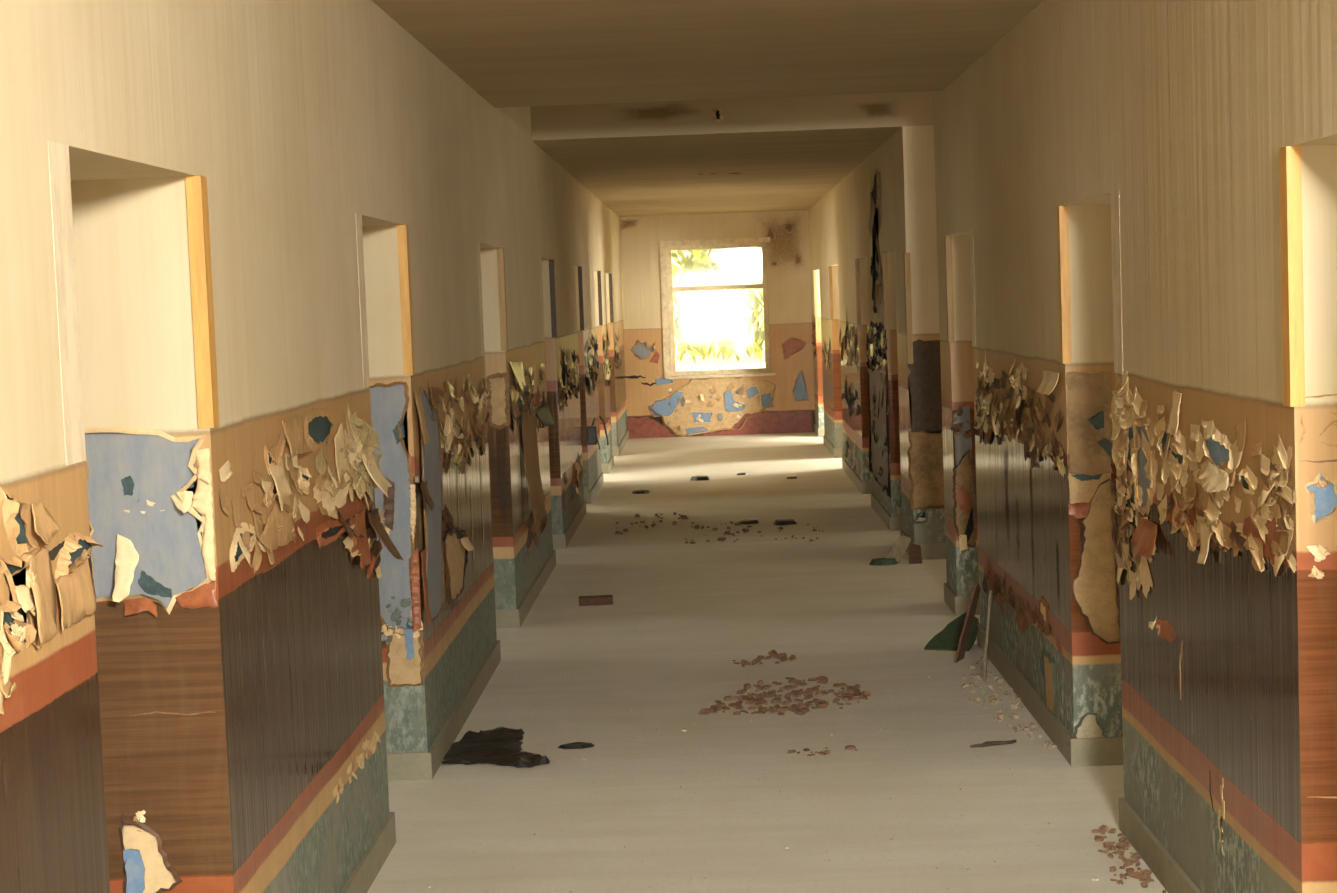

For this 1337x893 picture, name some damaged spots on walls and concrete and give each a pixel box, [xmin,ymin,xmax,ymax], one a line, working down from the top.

water stain [869,168,883,313]
peeling [781,314,891,498]
peeling [0,325,813,715]
peeling [907,339,1337,644]
peeling [982,560,1062,716]
peeling [332,731,381,803]
flaking render [1073,712,1107,745]
peeling [118,810,183,893]